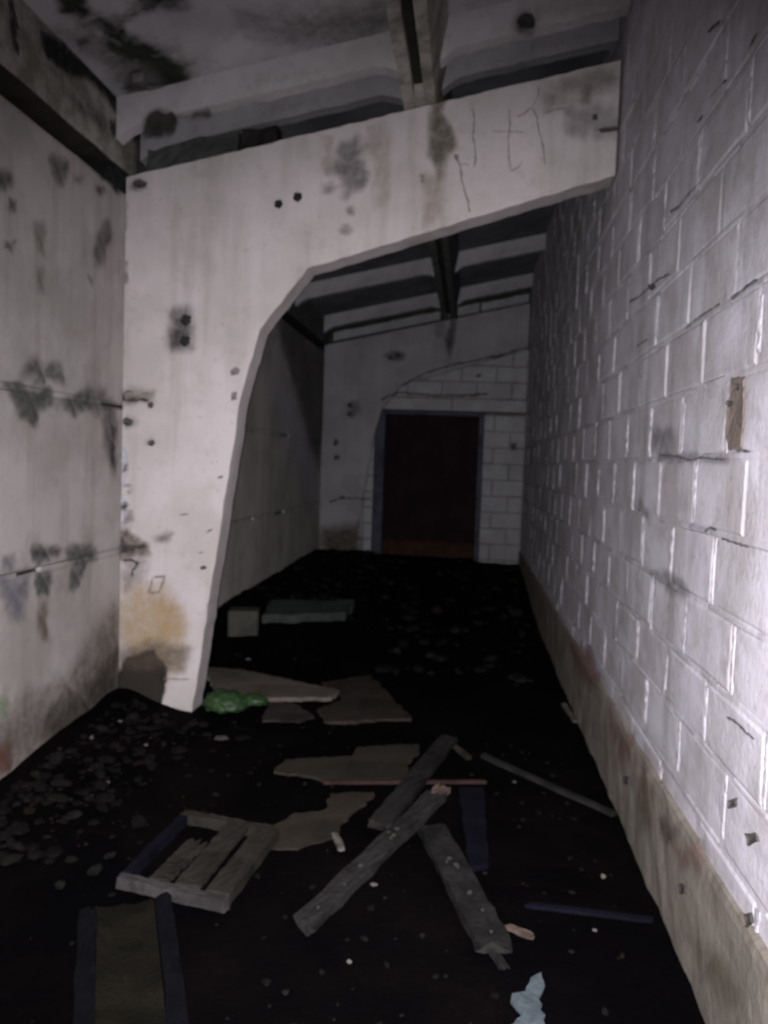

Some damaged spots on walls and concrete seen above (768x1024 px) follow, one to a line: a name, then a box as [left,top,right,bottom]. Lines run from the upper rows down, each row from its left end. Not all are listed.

damp [42,0,191,136]
damp [430,103,454,167]
damp [7,362,64,420]
crack [660,449,750,464]
damp [2,573,51,613]
damp [32,546,93,588]